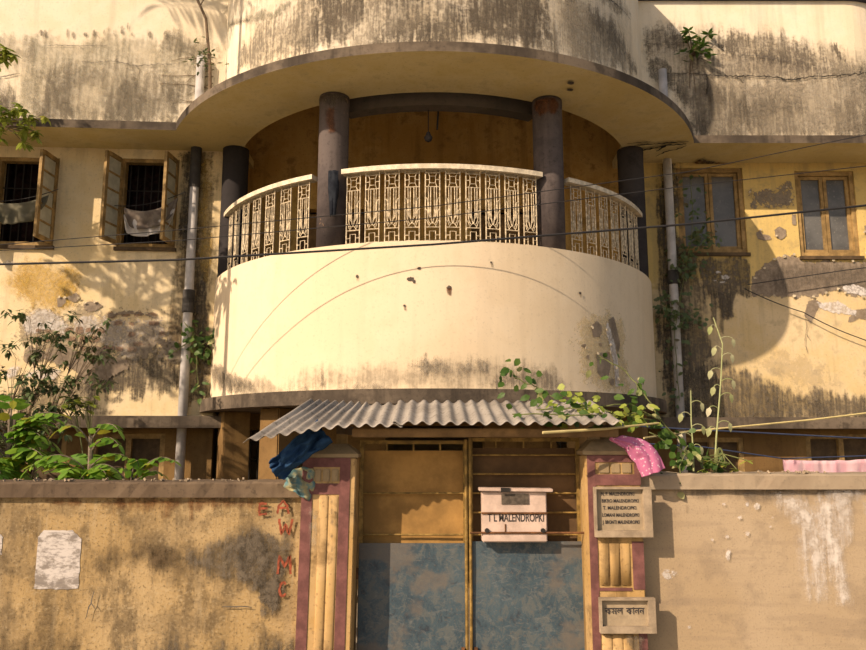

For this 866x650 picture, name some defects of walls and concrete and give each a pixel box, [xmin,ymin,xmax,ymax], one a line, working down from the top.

leakage [0,25,148,121]
leakage [240,19,276,69]
leakage [293,0,637,74]
crack [667,54,866,94]
leakage [706,32,866,135]
peeling [748,181,796,241]
leakage [656,163,866,417]
flaking render [751,253,866,323]
flaking render [7,293,181,383]
peeling [581,316,620,386]
leakage [131,528,291,616]
efflorescence [784,499,849,602]